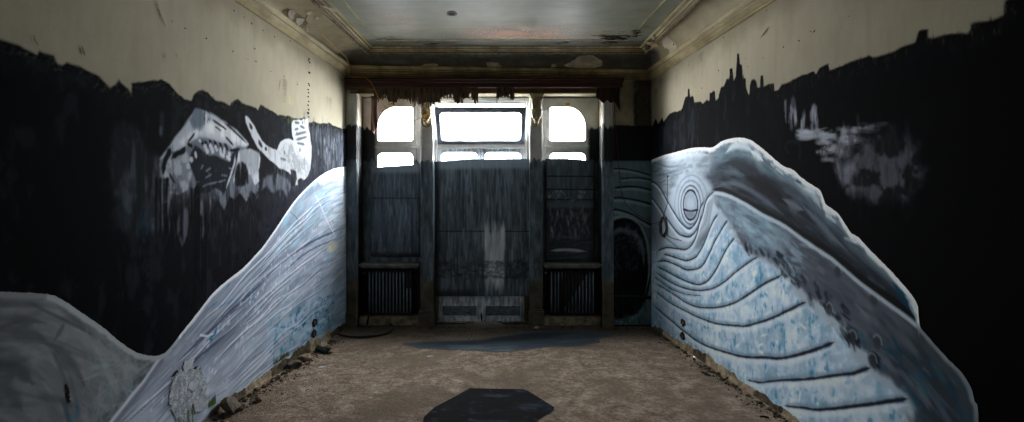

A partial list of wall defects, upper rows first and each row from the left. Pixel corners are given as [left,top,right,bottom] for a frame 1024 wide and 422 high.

spalling [168,357,223,422]
flaking render [232,319,347,400]